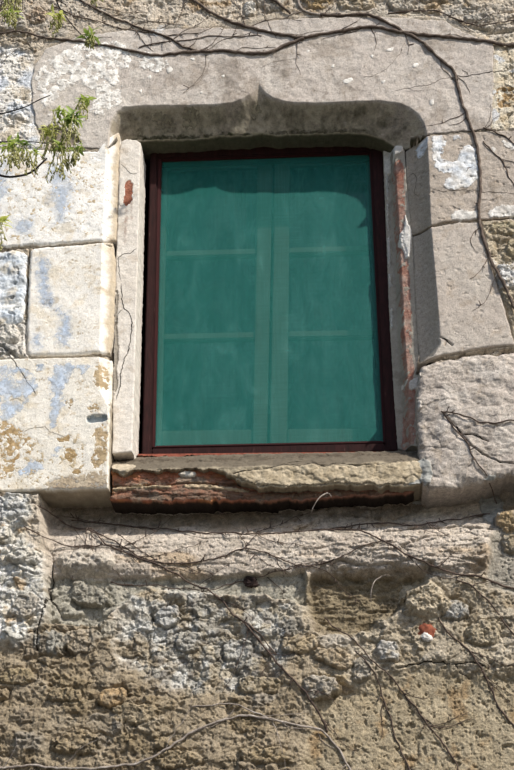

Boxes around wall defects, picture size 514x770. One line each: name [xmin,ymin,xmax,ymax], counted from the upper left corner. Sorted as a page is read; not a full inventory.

peeling [0,40,169,240]
peeling [415,135,479,190]
crack [4,245,73,392]
crack [107,245,135,399]
spalling [383,146,422,450]
spalling [178,460,422,493]
crack [28,563,62,650]